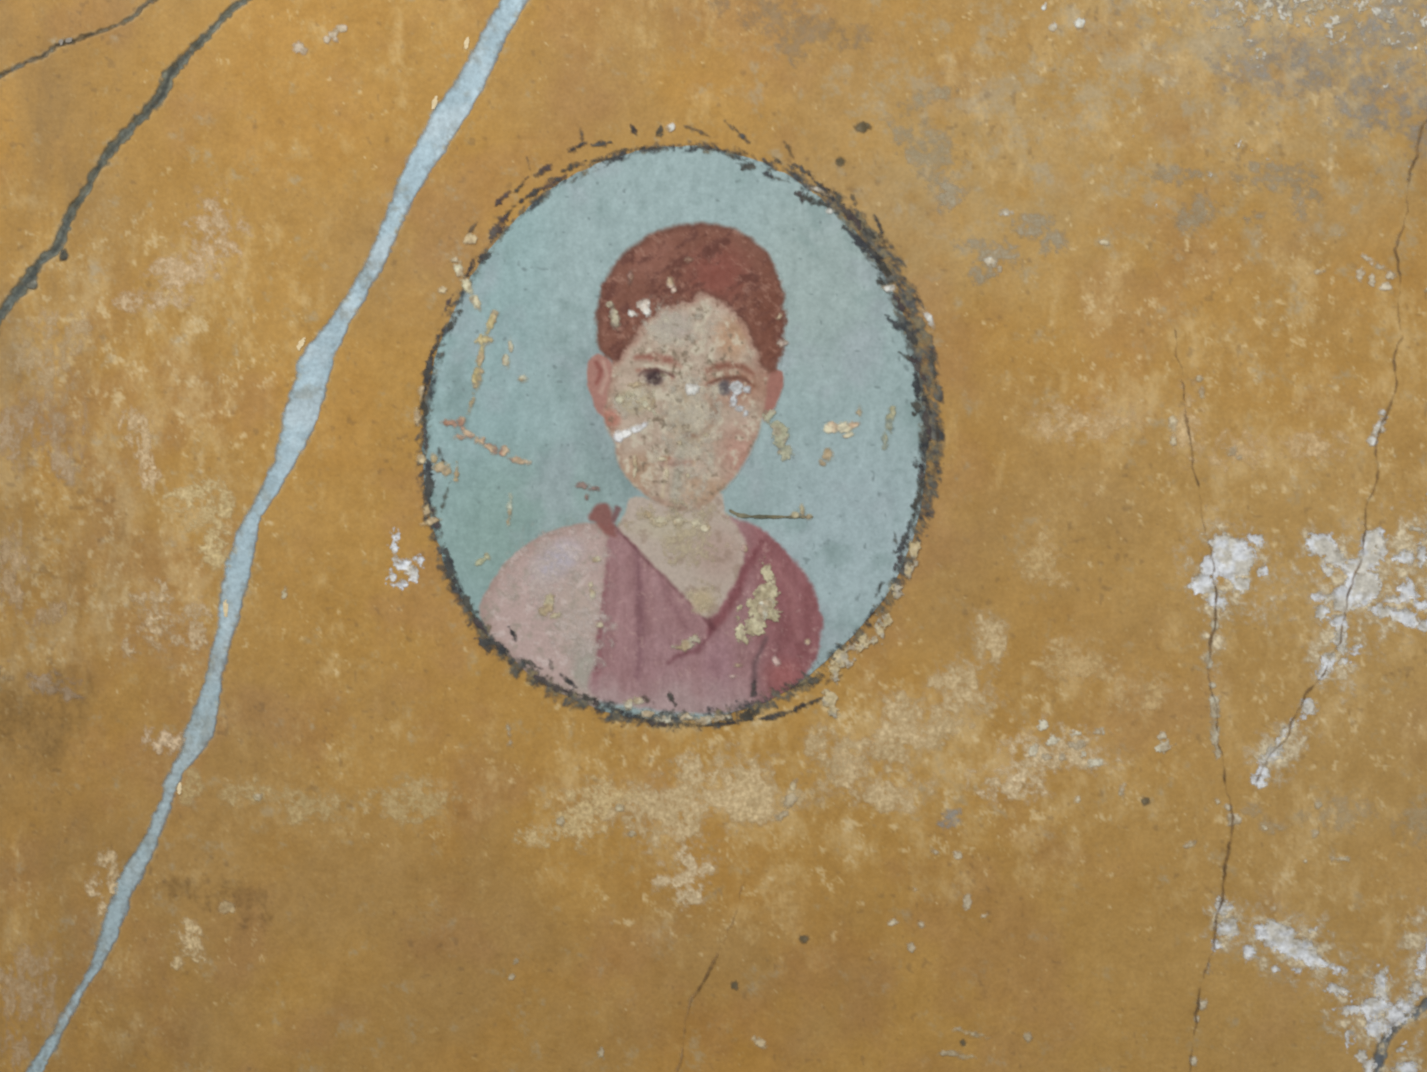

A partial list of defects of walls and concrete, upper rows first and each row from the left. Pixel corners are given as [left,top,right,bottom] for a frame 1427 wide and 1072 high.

crack [1394,121,1426,275]
peeling [606,299,650,327]
peeling [729,381,792,461]
crack [0,0,527,1072]
crack [1208,562,1218,729]
spalling [1187,532,1268,630]
crack [1280,351,1397,745]
spalling [1305,526,1427,684]
spalling [1250,698,1319,788]
crack [1190,773,1259,1058]
spalling [1207,896,1427,1072]
crack [1374,998,1427,1072]